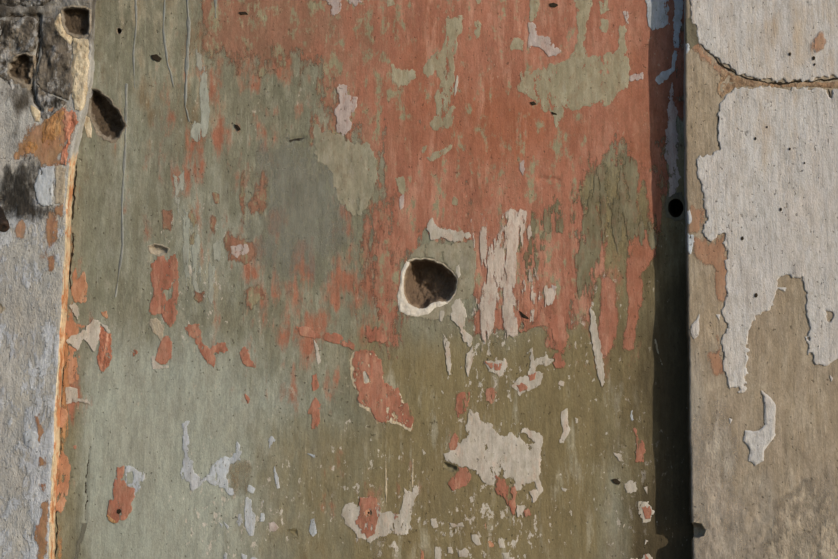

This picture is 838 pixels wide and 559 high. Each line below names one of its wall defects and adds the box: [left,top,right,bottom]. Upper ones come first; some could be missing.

spalling [0,0,92,138]
crack [701,44,838,123]
corrosion [43,203,63,271]
peeling [56,223,112,428]
peeling [147,171,256,369]
peeling [185,0,838,431]
corrosion [34,501,62,559]
corrosion [56,333,70,498]
peeling [341,459,419,543]
peeling [442,392,543,517]
peeling [611,479,655,523]
peeling [743,391,776,466]